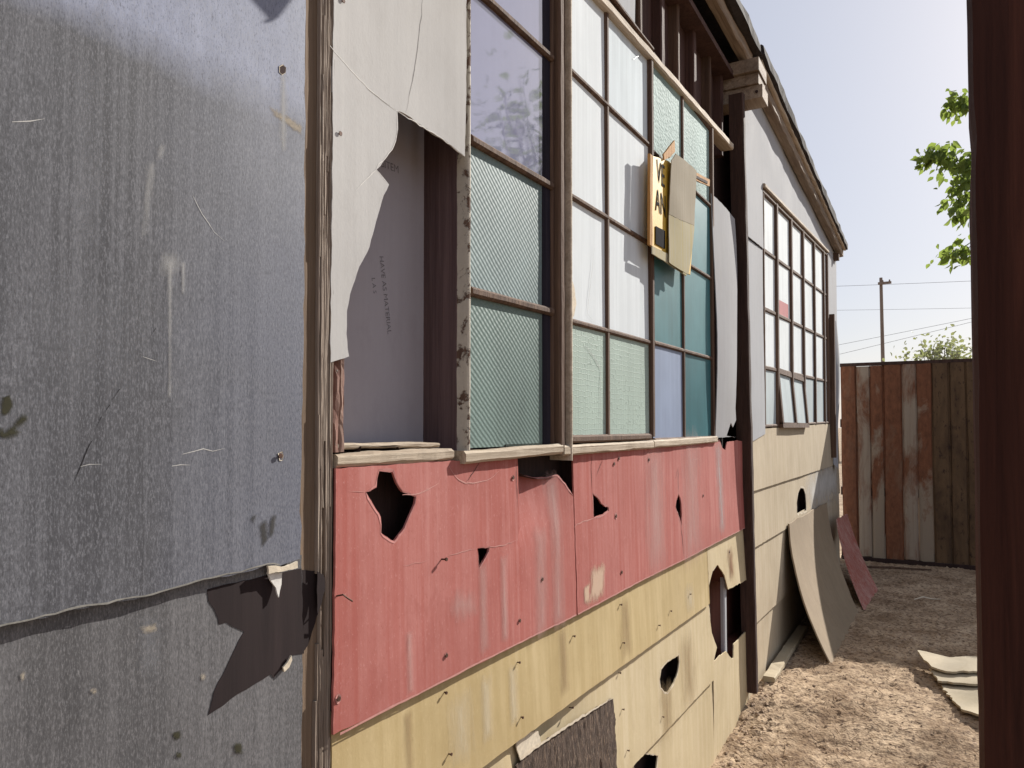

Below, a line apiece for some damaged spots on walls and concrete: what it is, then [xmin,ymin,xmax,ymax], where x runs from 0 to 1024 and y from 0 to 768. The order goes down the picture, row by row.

peeling [267,561,298,597]
spalling [515,697,617,768]